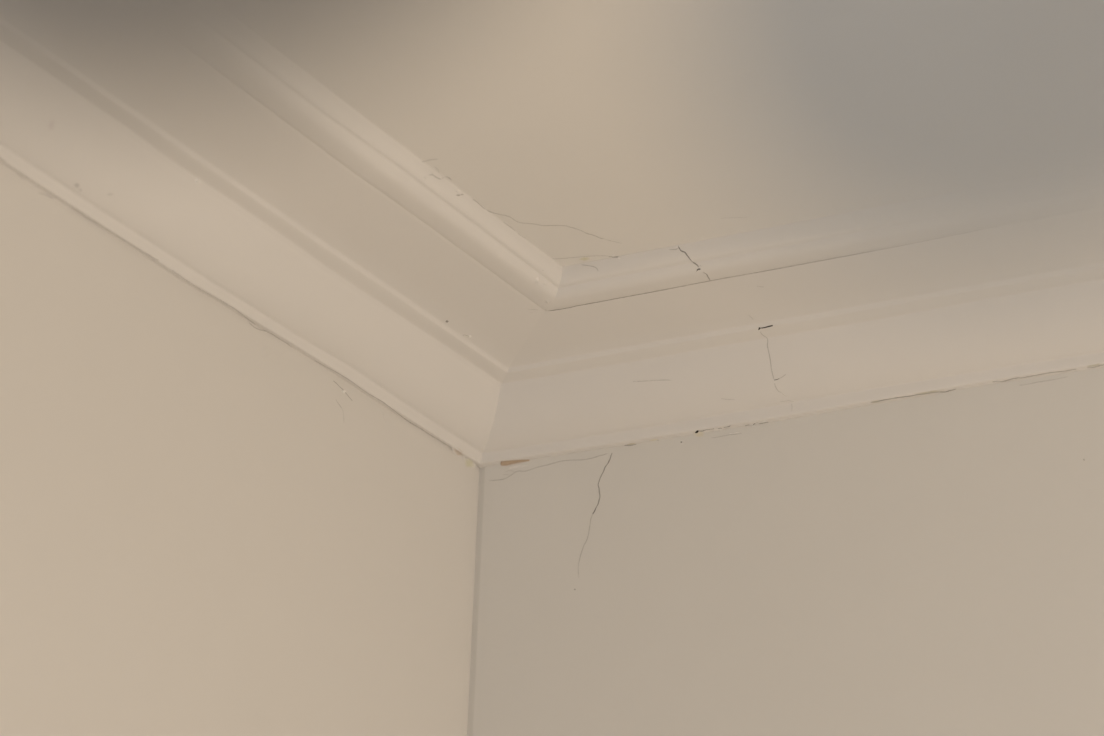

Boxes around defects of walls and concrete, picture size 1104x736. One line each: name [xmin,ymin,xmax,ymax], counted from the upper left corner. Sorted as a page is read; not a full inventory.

crack [547,246,862,311]
crack [750,316,794,405]
crack [489,454,612,576]